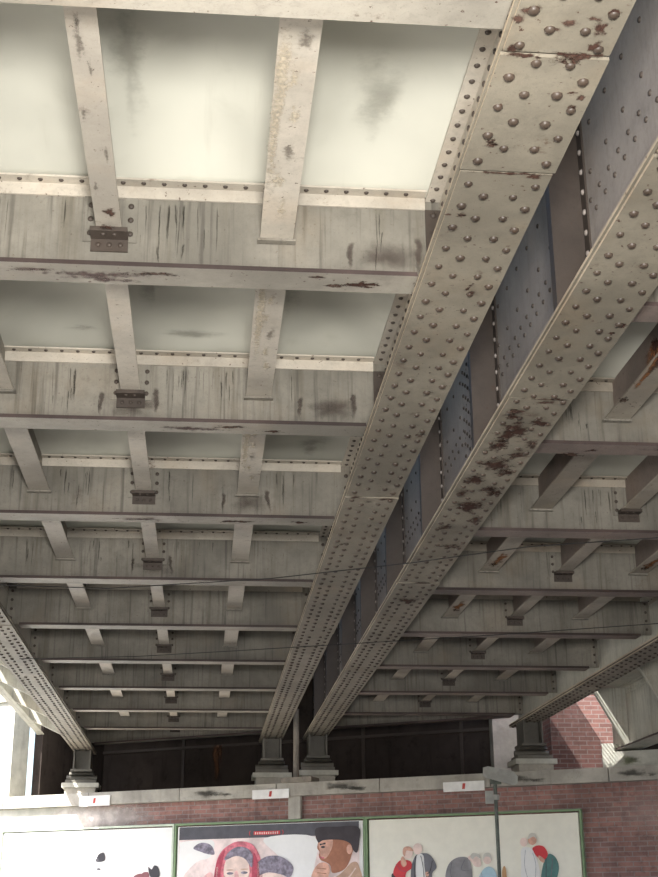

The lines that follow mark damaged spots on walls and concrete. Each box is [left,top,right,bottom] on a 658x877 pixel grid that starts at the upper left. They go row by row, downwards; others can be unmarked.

rust [507,45,539,59]
rust [554,9,622,65]
rust [57,271,175,282]
rust [635,338,658,388]
rust [453,409,548,527]